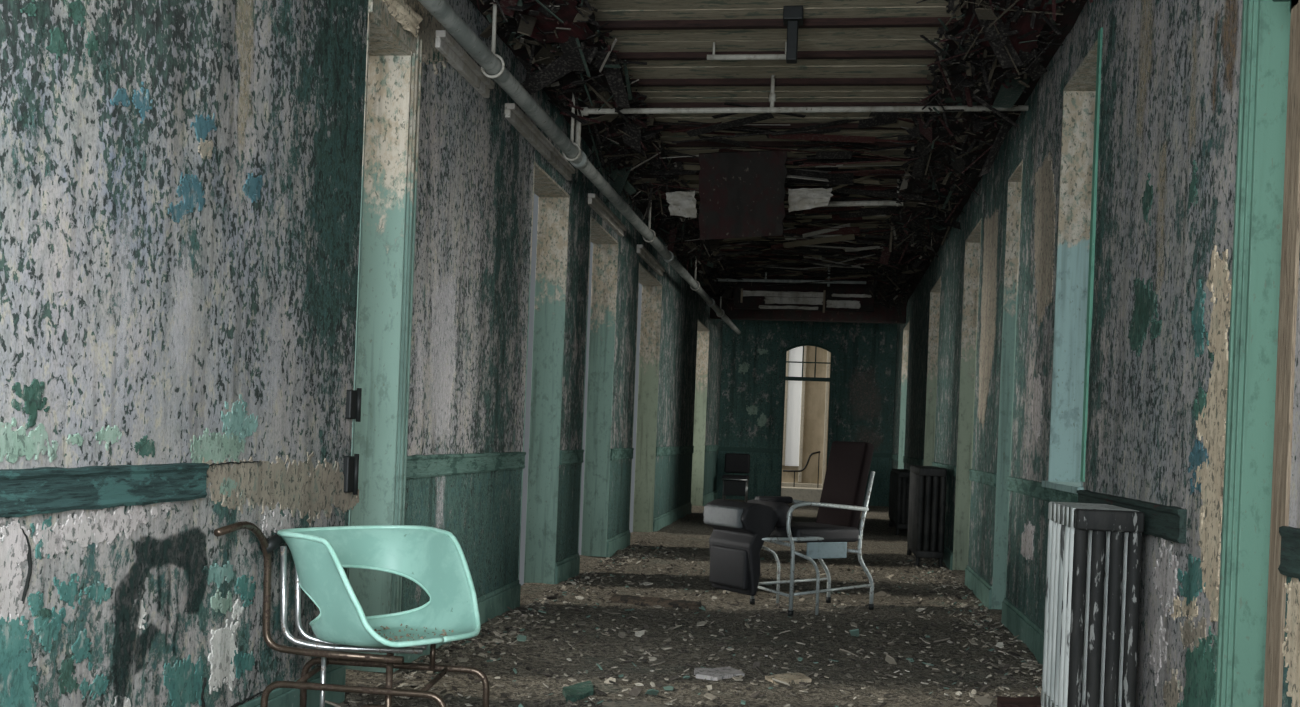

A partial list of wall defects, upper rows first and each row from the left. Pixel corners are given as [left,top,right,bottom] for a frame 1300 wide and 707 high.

peeling [46,0,100,60]
peeling [167,172,206,223]
flaking render [743,290,872,310]
spalling [978,208,999,429]
peeling [1128,278,1162,357]
spalling [0,502,171,707]
leakage [113,527,208,707]
peeling [163,561,256,707]
spalling [190,394,359,538]
spalling [1020,521,1035,560]
spalling [1149,245,1232,707]
spalling [1282,578,1300,707]